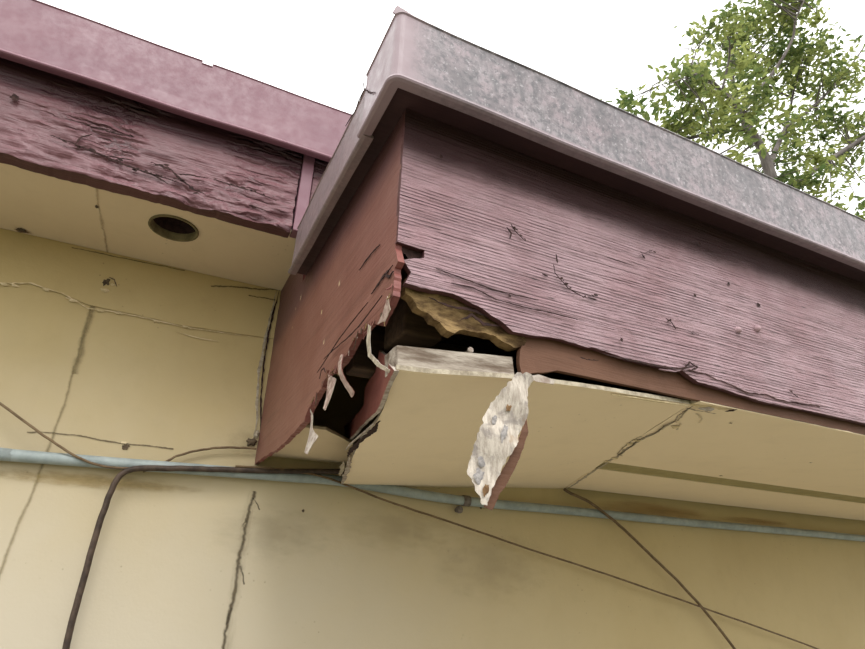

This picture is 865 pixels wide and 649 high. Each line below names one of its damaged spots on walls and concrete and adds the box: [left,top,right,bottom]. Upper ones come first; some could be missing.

crack [49,124,277,213]
crack [211,285,276,300]
peeling [436,268,578,320]
peeling [366,296,391,373]
peeling [323,354,355,410]
peeling [602,353,821,407]
peeling [304,409,318,454]
peeling [467,372,555,510]
crack [566,406,693,489]
crack [222,491,260,649]